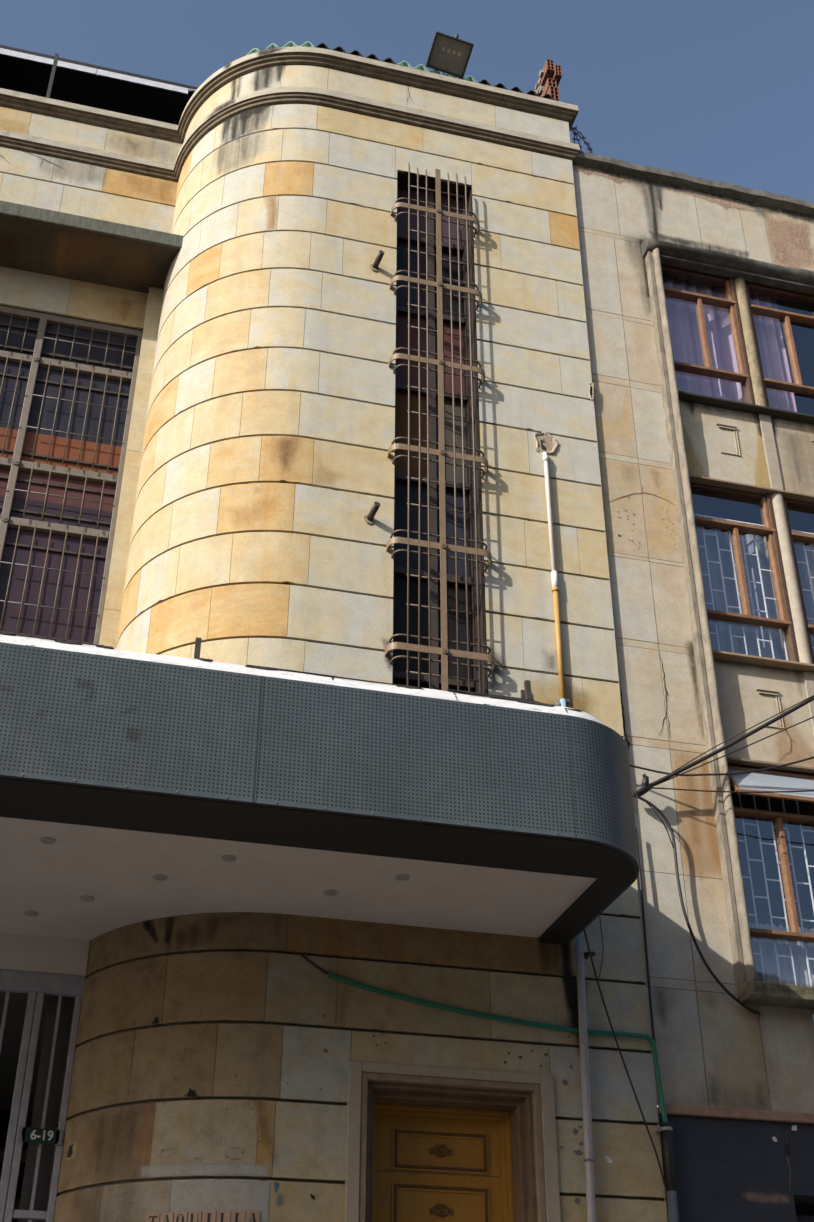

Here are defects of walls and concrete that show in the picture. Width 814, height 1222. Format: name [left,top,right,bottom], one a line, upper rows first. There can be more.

leakage [208,62,269,141]
leakage [255,47,283,90]
crack [619,681,631,752]
crack [659,652,671,740]
leakage [145,918,174,943]